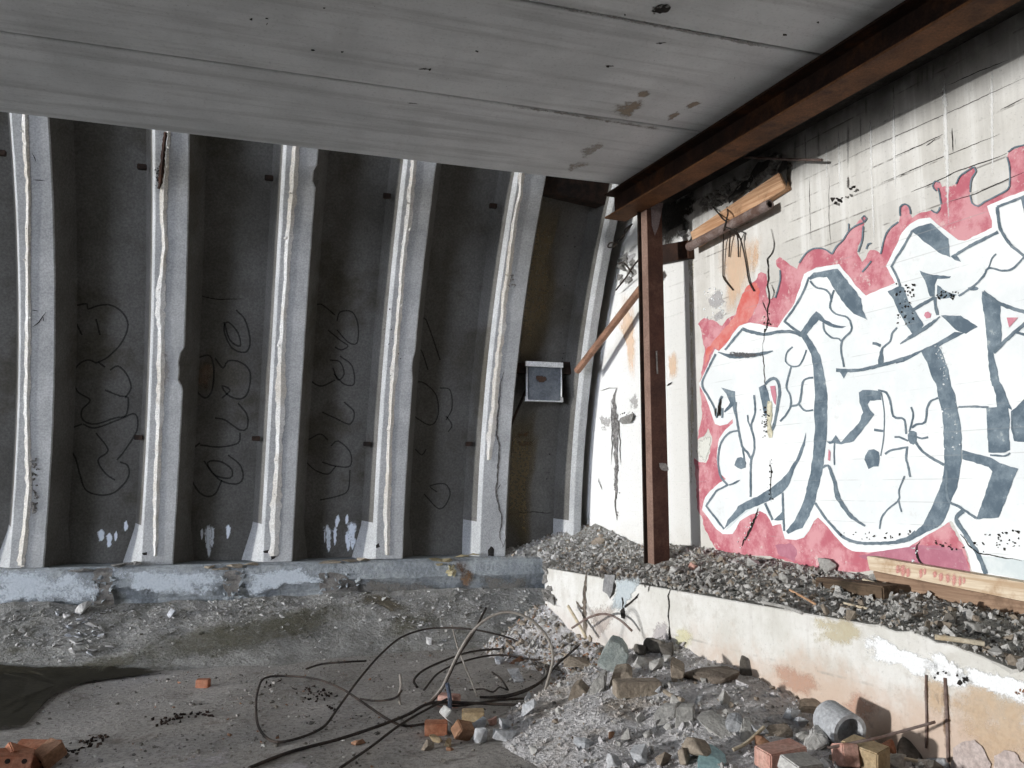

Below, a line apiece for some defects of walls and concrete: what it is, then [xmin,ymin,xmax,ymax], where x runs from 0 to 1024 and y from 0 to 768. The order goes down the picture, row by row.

crack [737,231,774,548]
crack [495,373,544,547]
spalling [68,552,147,606]
spalling [204,550,276,601]
spalling [318,558,370,595]
crack [622,583,671,640]
damp [820,621,1024,704]
damp [0,664,163,728]